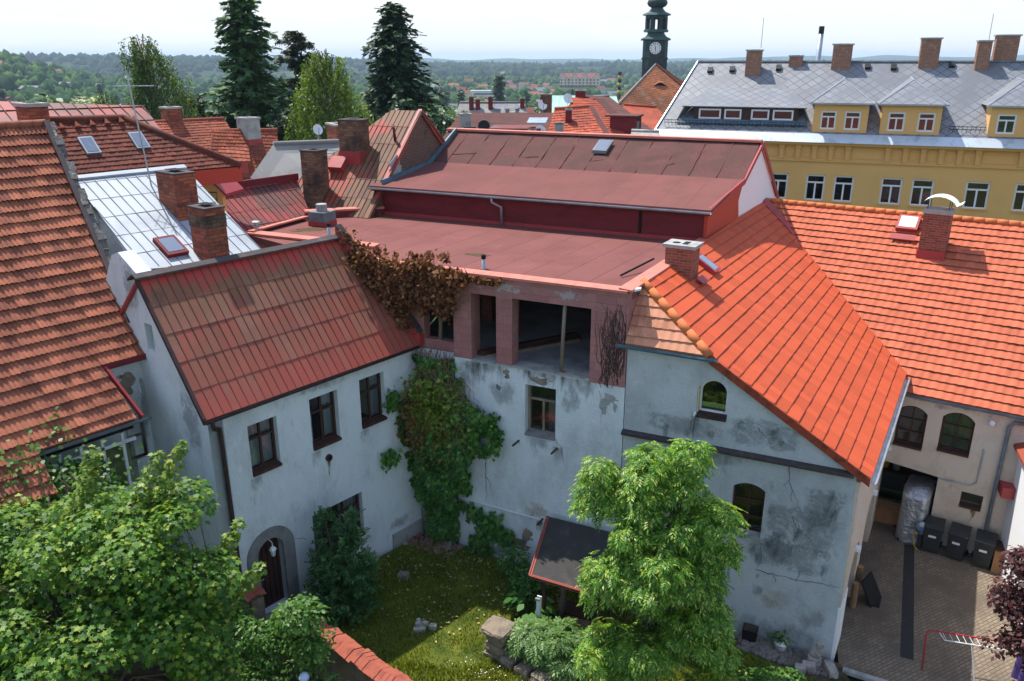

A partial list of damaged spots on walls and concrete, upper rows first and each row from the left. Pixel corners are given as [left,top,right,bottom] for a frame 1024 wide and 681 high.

peeling [599,393,618,415]
crack [755,428,840,588]